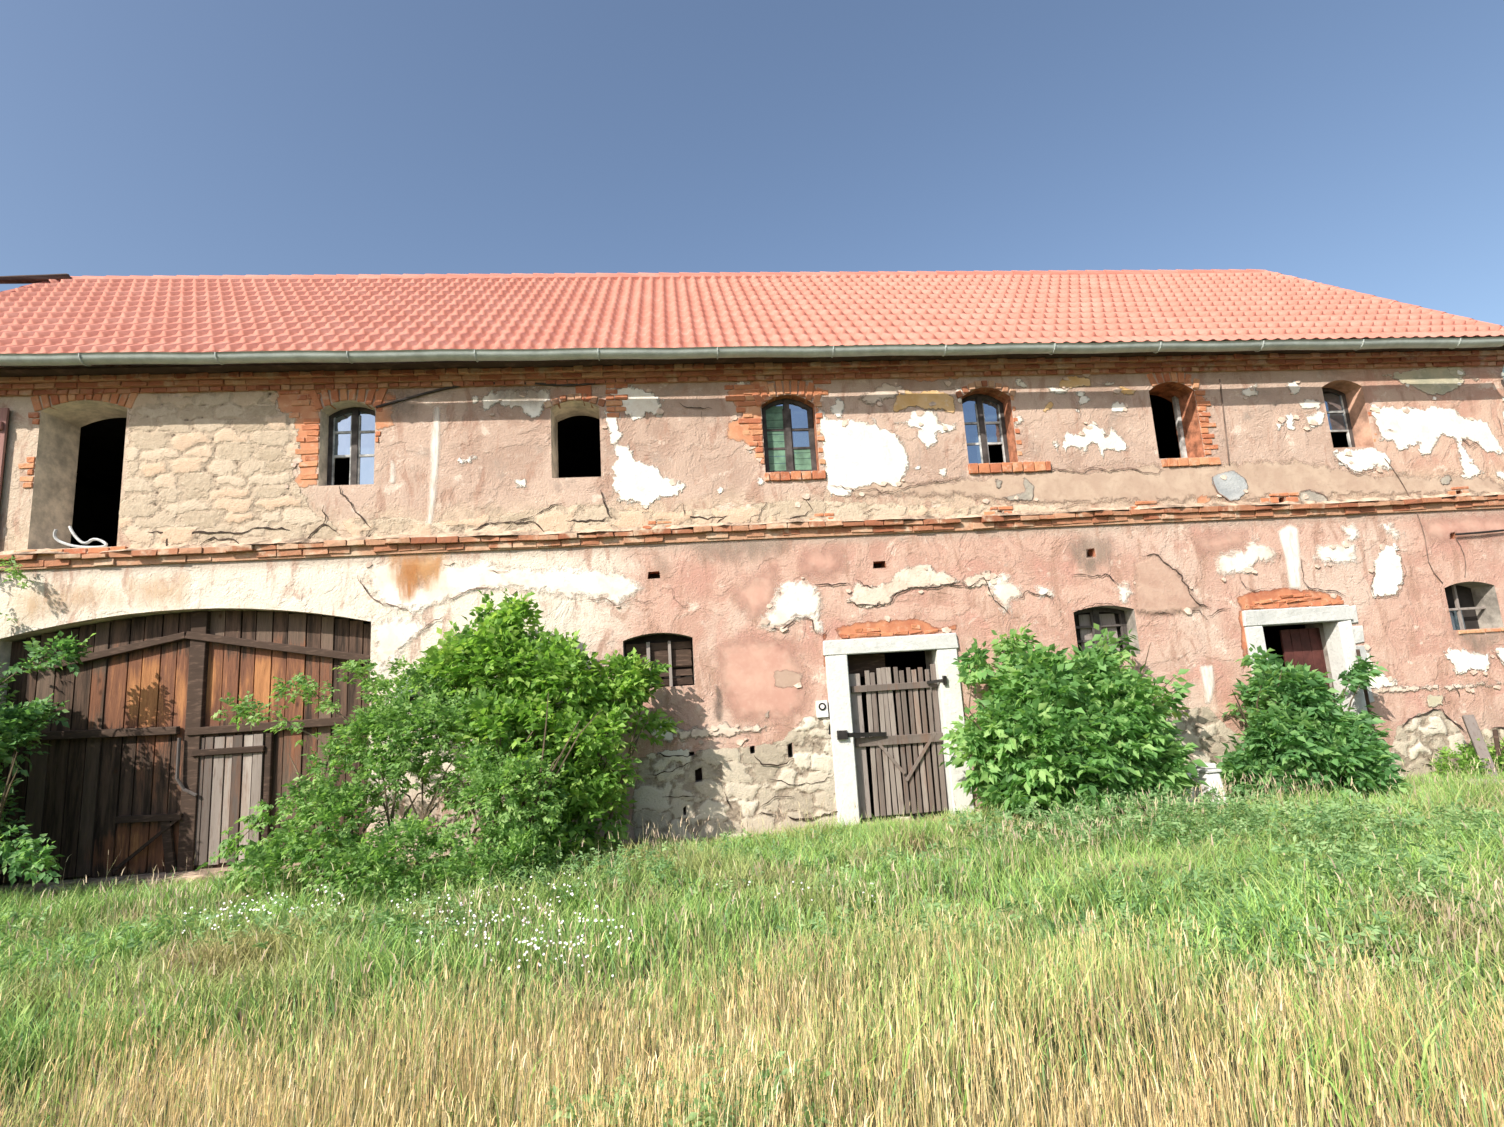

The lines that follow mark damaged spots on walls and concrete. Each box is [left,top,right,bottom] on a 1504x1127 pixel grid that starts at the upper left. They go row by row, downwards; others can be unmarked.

spalling [118,367,1504,551]
crack [149,486,375,546]
crack [473,490,610,535]
crack [357,569,512,635]
peeling [732,564,1054,667]
crack [775,553,1407,635]
peeling [1118,582,1133,603]
spalling [1216,538,1342,669]
peeling [1313,523,1404,598]
peeling [1364,643,1504,697]
spalling [631,711,838,842]
spalling [1390,710,1504,779]